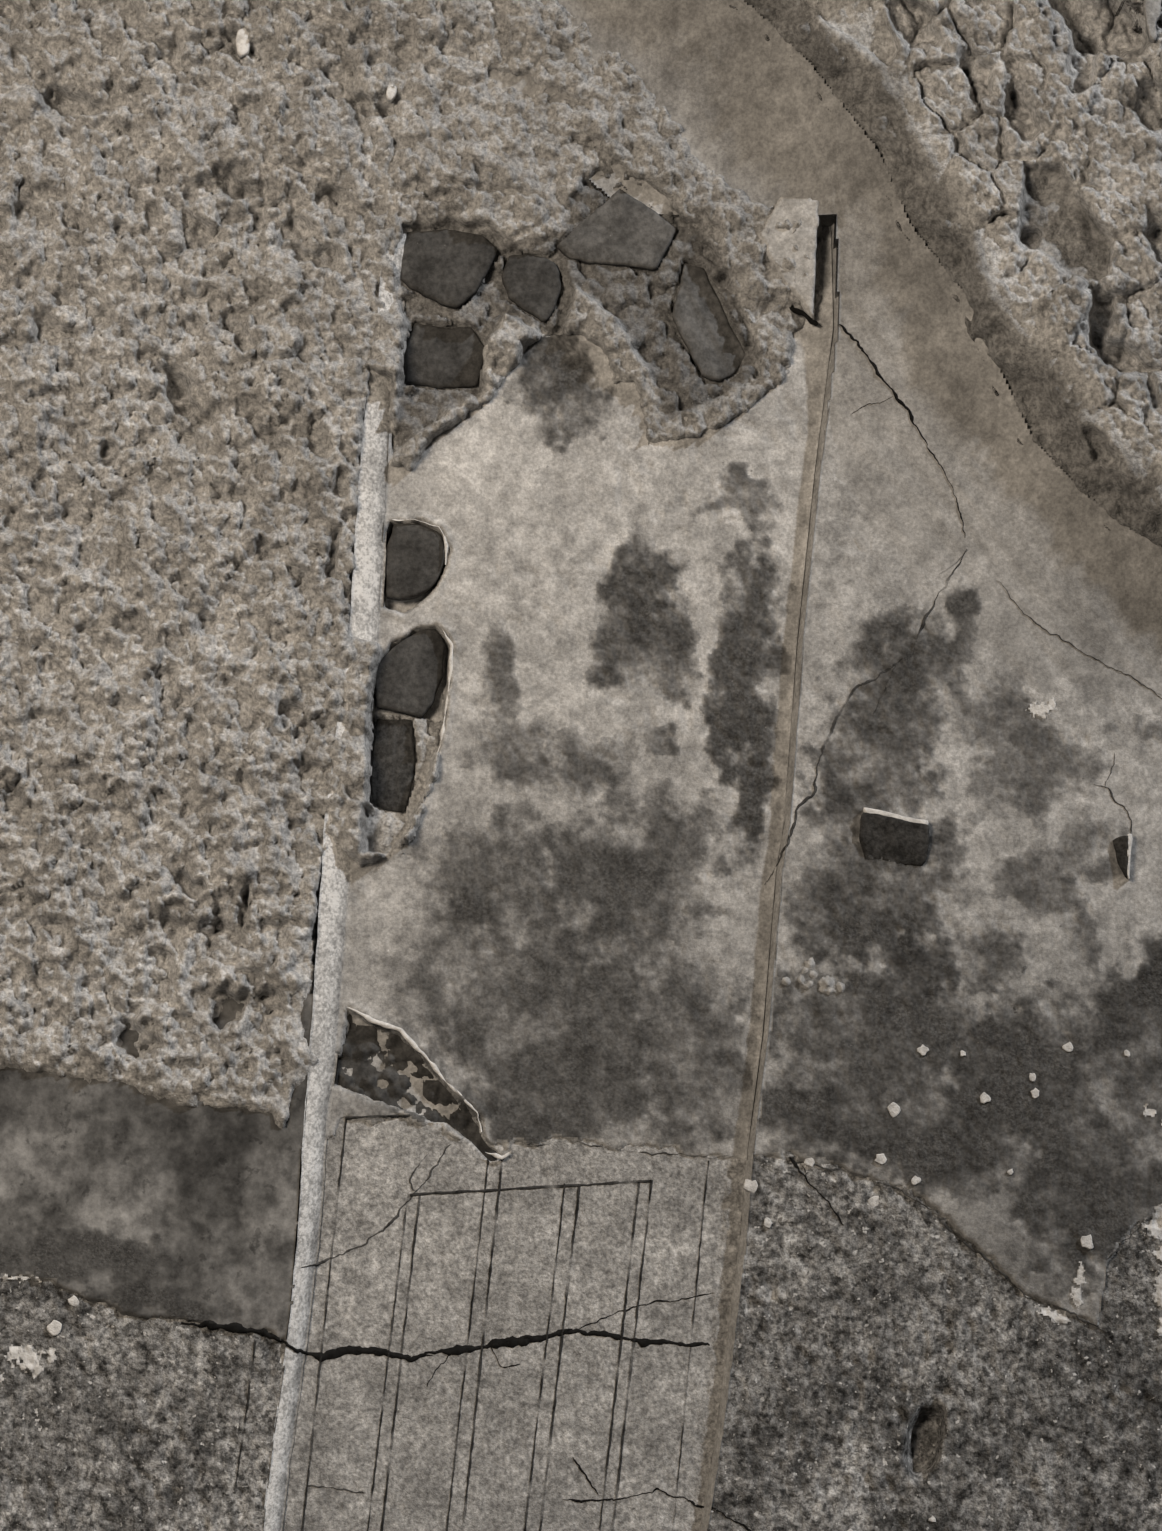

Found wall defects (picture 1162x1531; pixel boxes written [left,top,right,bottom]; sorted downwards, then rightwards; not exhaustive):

spalling [729,0,1162,547]
damp [729,464,764,487]
flaking render [0,0,824,1129]
damp [587,506,787,852]
crack [764,305,968,885]
crack [1008,594,1162,699]
crack [1094,752,1132,832]
damp [406,590,1162,1336]
spalling [781,956,845,996]
flaking render [335,1007,511,1161]
crack [789,1157,843,1225]
crack [181,1293,711,1386]